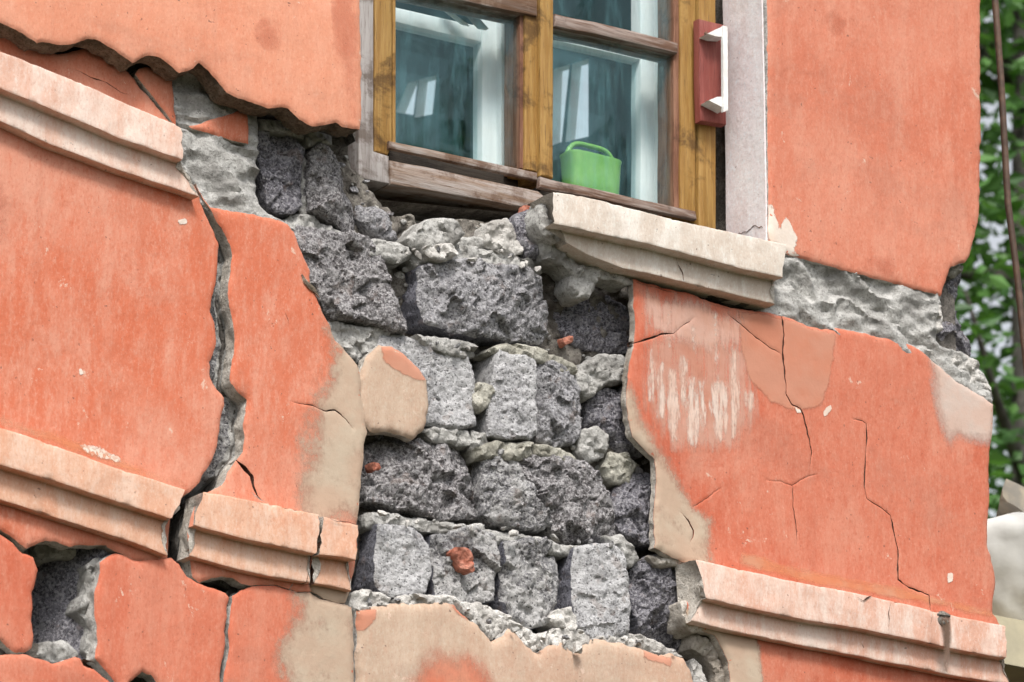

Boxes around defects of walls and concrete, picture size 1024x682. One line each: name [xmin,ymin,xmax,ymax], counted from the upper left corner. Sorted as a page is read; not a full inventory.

crack [54,46,84,54]
crack [126,63,151,77]
crack [177,237,238,569]
spalling [172,73,763,682]
spalling [646,204,993,446]
crack [289,519,357,590]